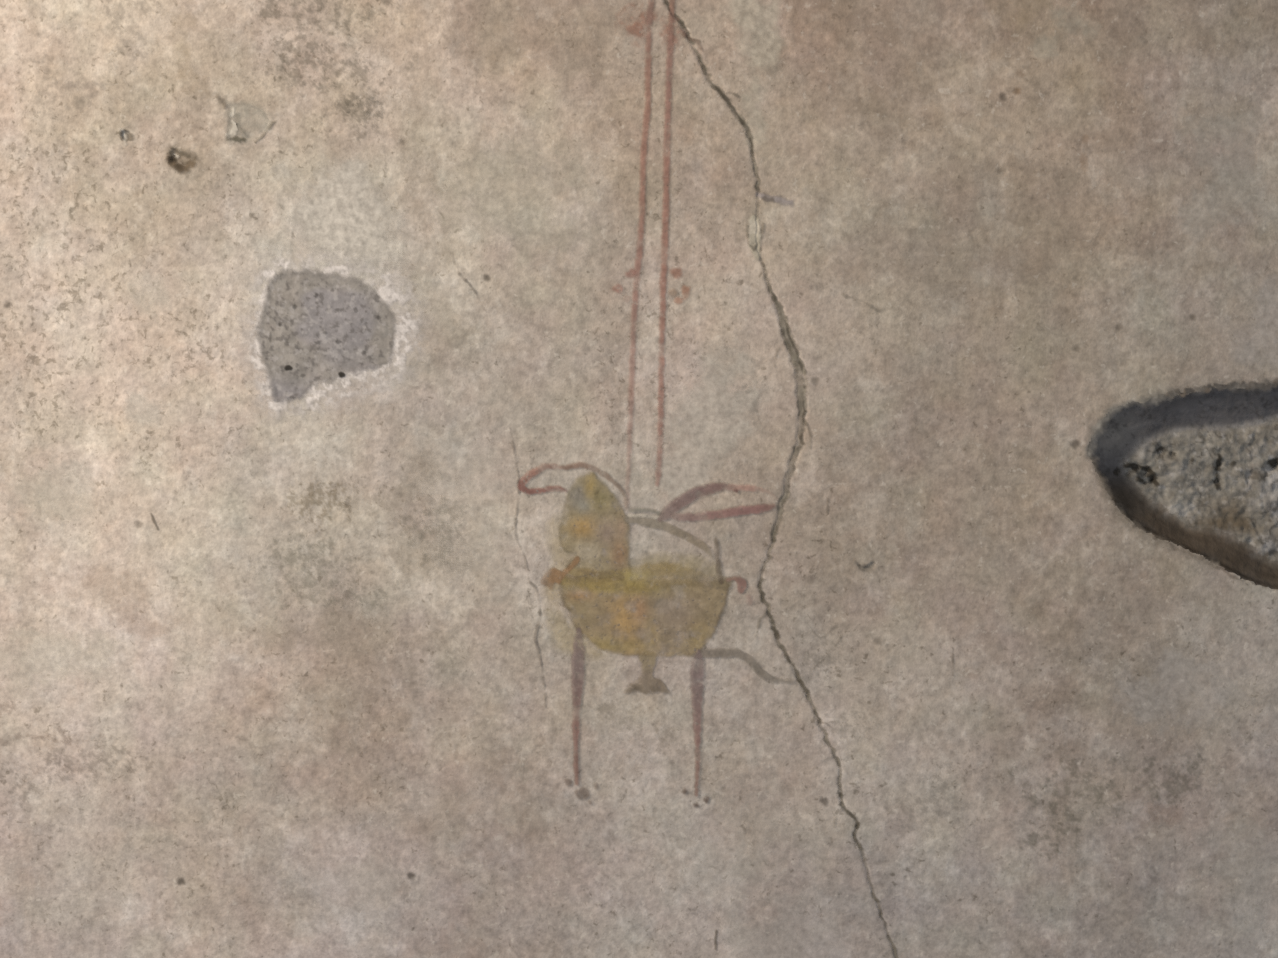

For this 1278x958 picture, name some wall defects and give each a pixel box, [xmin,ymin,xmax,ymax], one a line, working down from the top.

crack [664,1,806,456]
spalling [1087,381,1278,589]
crack [758,489,862,850]
crack [874,897,898,958]